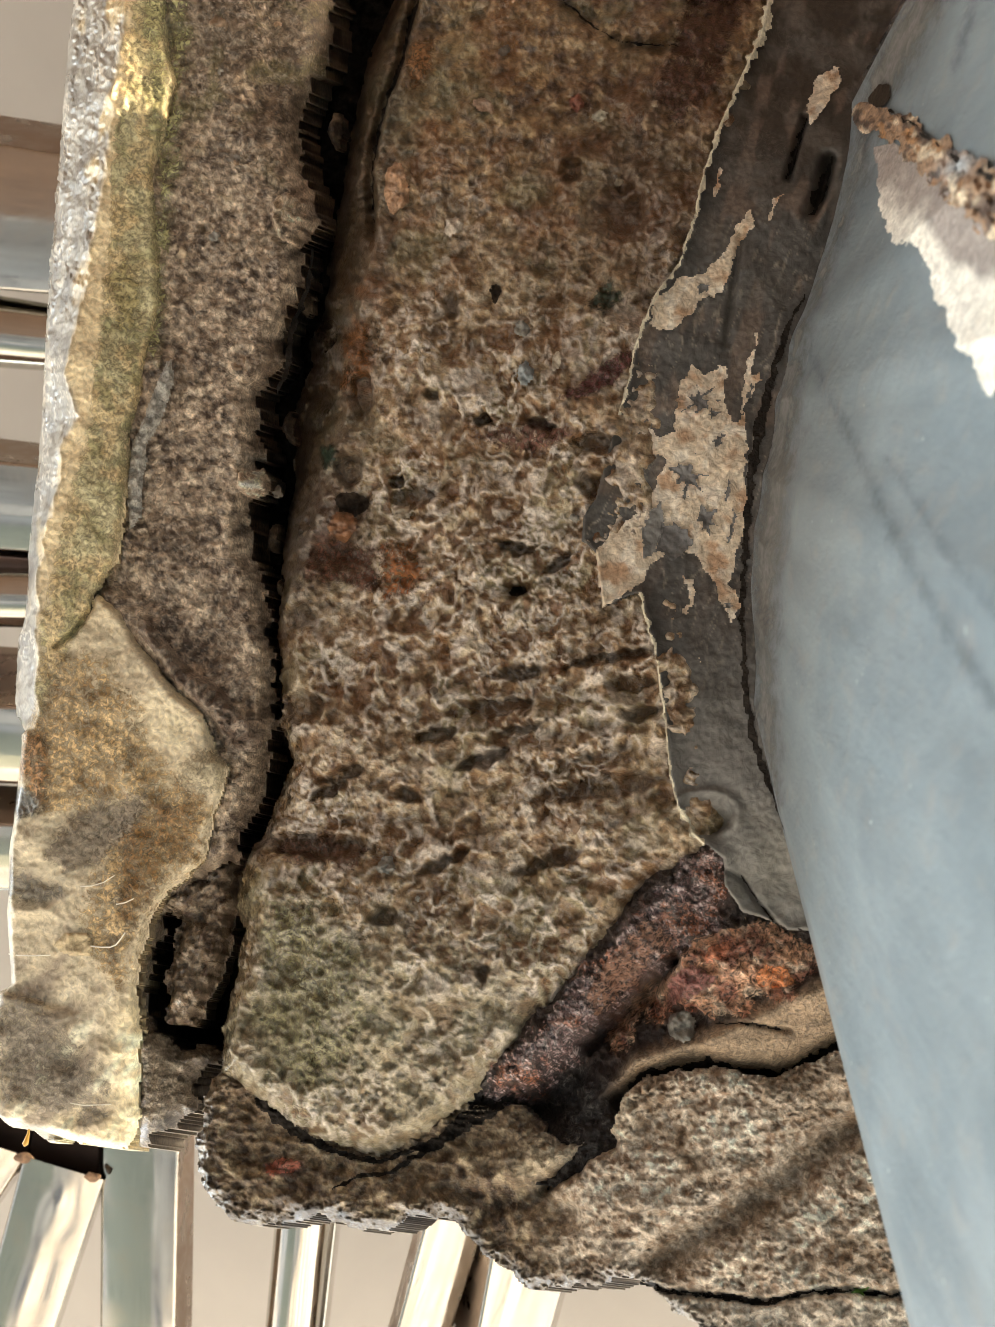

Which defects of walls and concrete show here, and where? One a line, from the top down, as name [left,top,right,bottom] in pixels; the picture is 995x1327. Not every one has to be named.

peeling [806,66,842,125]
peeling [851,83,995,397]
crack [268,0,419,782]
spalling [98,0,784,1157]
crack [166,927,246,1049]
crack [254,1080,525,1190]
rust [484,846,818,1112]
spalling [527,863,837,1188]
crack [640,1278,902,1306]